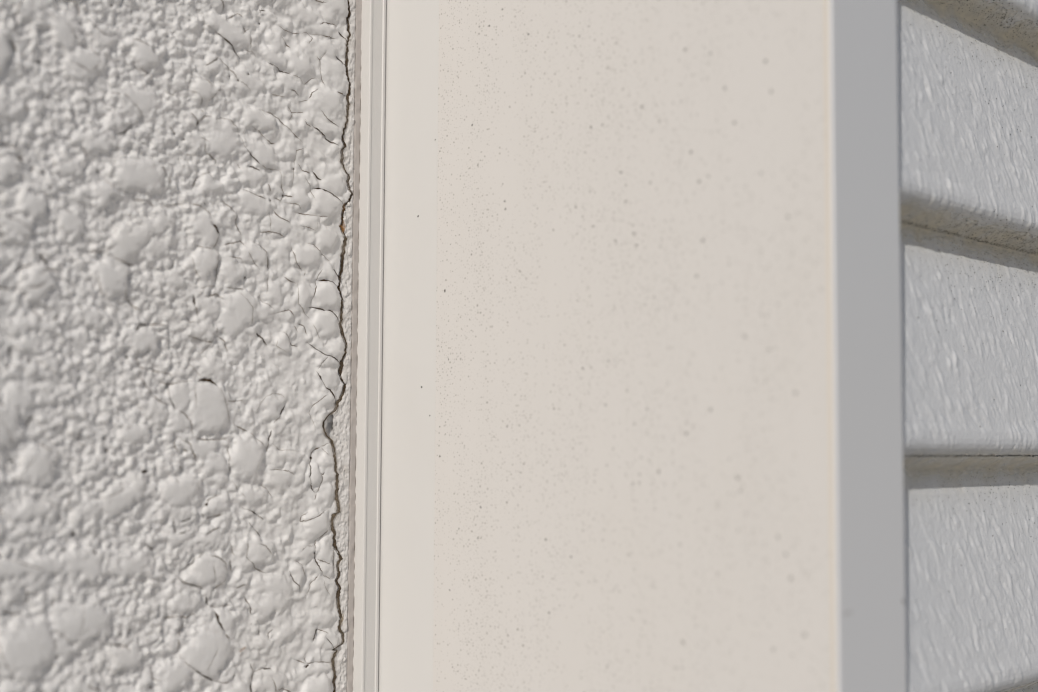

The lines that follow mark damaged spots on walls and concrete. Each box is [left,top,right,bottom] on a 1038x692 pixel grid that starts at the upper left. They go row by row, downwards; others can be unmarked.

crack [65,0,108,71]
crack [0,190,59,322]
crack [83,0,353,692]